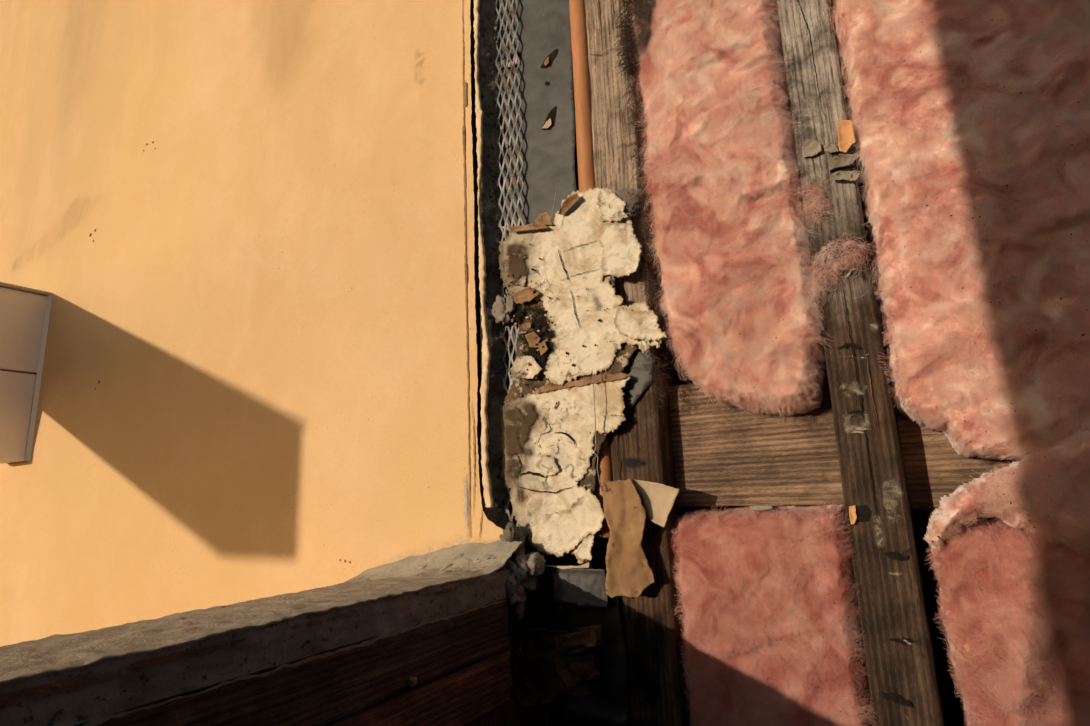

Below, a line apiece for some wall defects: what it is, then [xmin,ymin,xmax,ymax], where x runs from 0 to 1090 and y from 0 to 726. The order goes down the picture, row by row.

spalling [801,120,861,181]
spalling [478,0,510,530]
spalling [849,504,872,524]